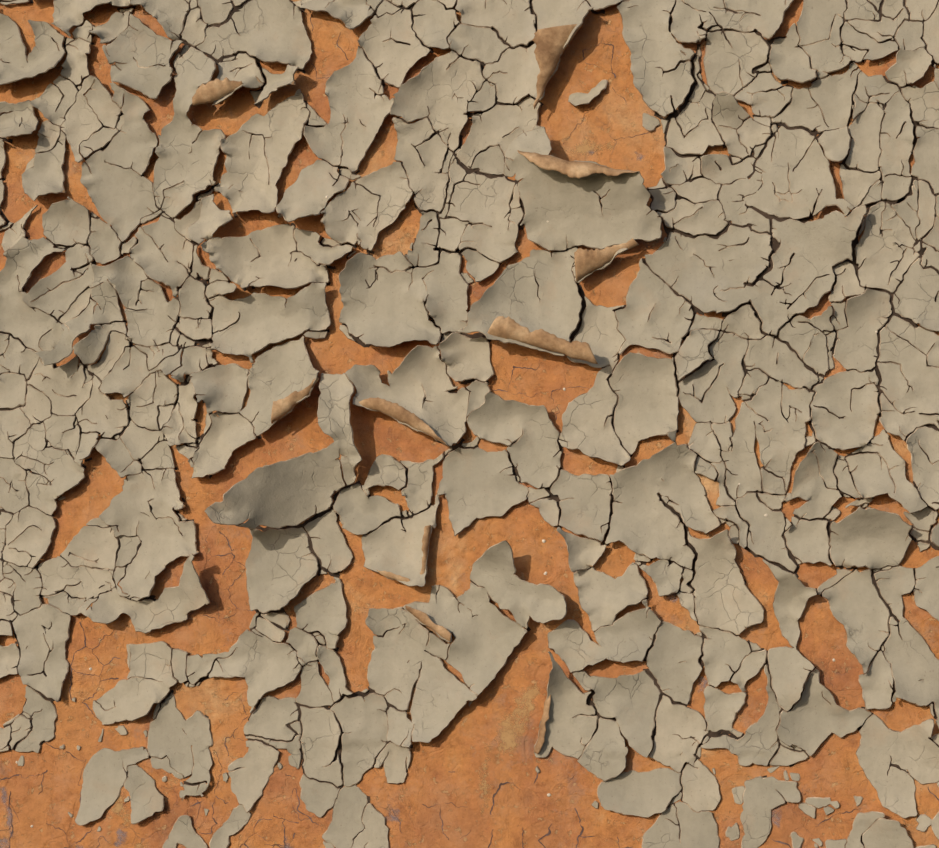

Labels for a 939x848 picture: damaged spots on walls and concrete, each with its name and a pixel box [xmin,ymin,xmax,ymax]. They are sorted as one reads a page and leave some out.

crack [163,0,267,108]
crack [277,0,544,362]
peeling [461,230,548,294]
peeling [579,262,639,307]
crack [610,0,939,669]
crack [0,196,407,848]
peeling [0,373,567,848]
crack [424,353,633,546]
peeling [547,599,661,673]
crack [635,494,823,778]
peeling [902,591,939,659]
peeling [508,700,720,848]